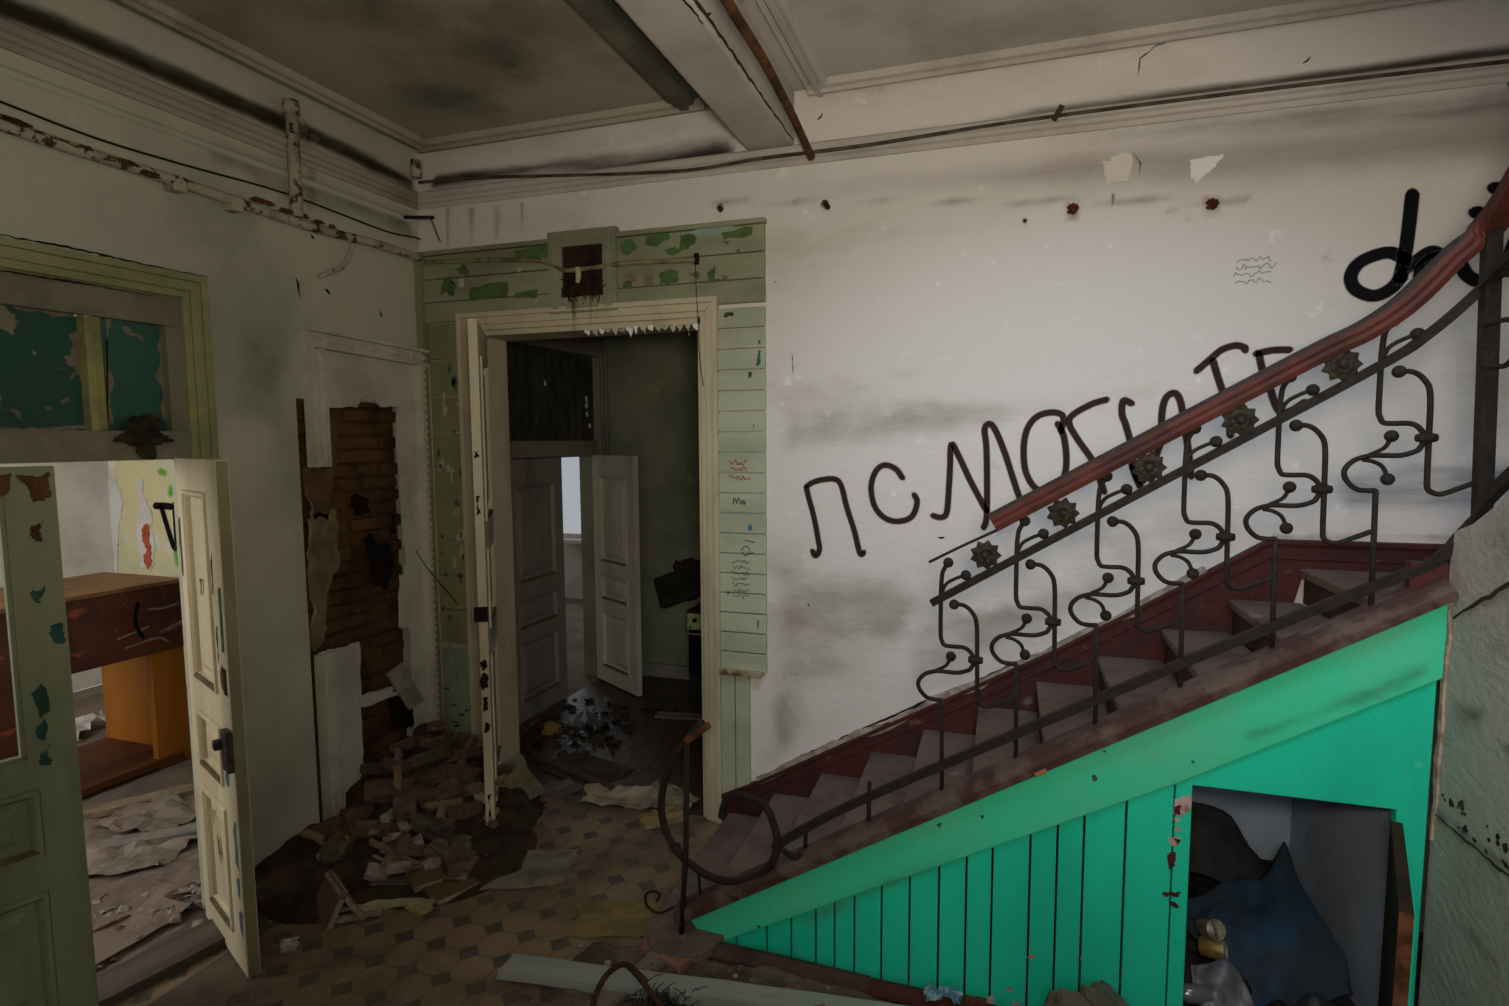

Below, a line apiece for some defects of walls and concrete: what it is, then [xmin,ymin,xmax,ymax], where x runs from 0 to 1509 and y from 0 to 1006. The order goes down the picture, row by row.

peeling [0,114,182,184]
peeling [249,196,337,239]
peeling [440,245,548,303]
peeling [619,225,753,289]
peeling [0,305,85,430]
peeling [105,319,166,425]
flaking render [296,399,414,822]
crack [1453,582,1509,619]